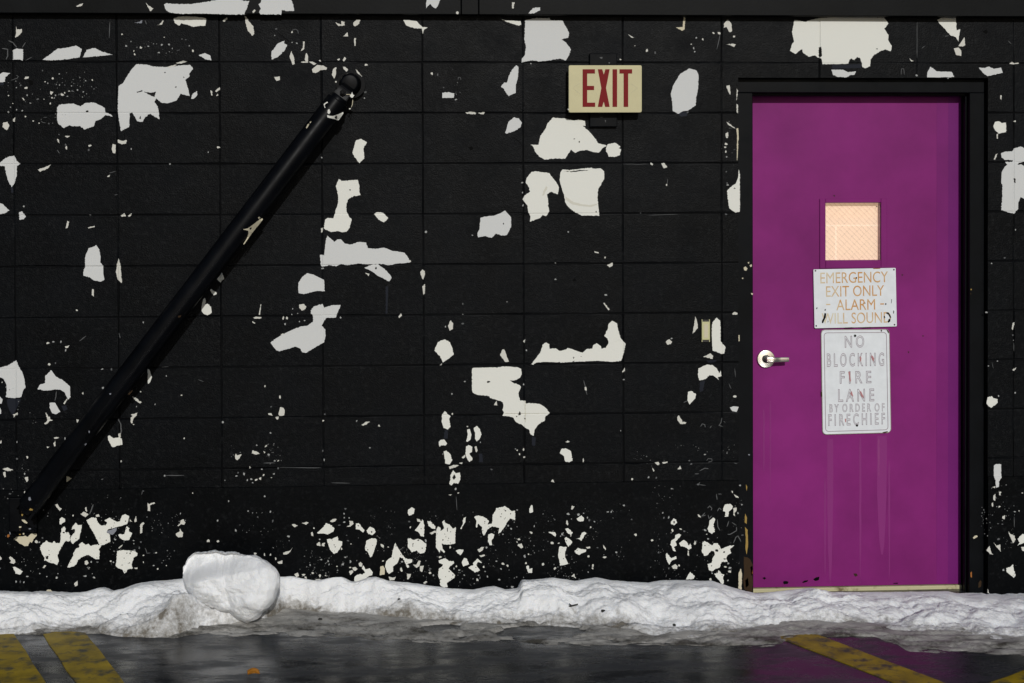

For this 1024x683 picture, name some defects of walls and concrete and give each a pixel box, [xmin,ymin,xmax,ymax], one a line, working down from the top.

peeling [146,0,294,36]
peeling [501,7,571,96]
peeling [790,17,892,78]
peeling [57,53,211,153]
peeling [523,118,621,222]
peeling [994,147,1024,214]
peeling [271,180,410,353]
peeling [0,360,71,424]
peeling [472,303,626,436]
peeling [14,502,155,573]
peeling [292,506,515,588]
peeling [666,491,739,584]